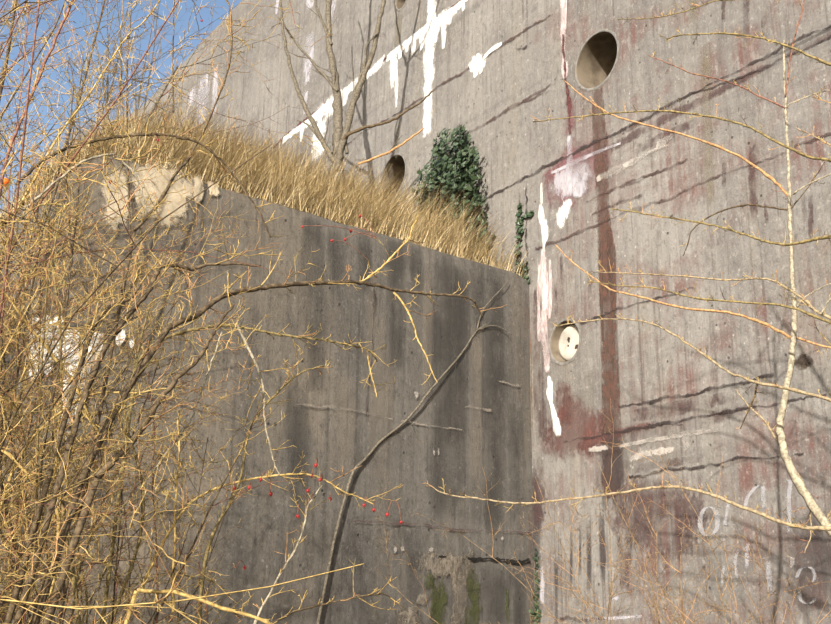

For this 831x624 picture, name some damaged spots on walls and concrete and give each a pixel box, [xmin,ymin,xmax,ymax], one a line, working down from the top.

rust [710,65,768,97]
rust [539,88,706,557]
rust [532,481,544,524]
crack [468,557,530,565]
spalling [420,547,474,624]